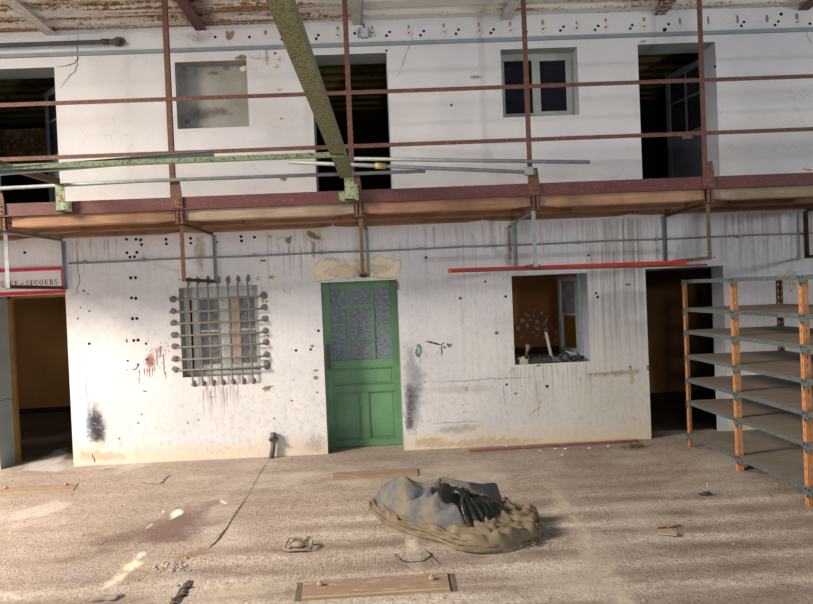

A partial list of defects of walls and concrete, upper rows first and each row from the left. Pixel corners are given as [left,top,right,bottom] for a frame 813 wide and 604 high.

crack [215,459,270,543]